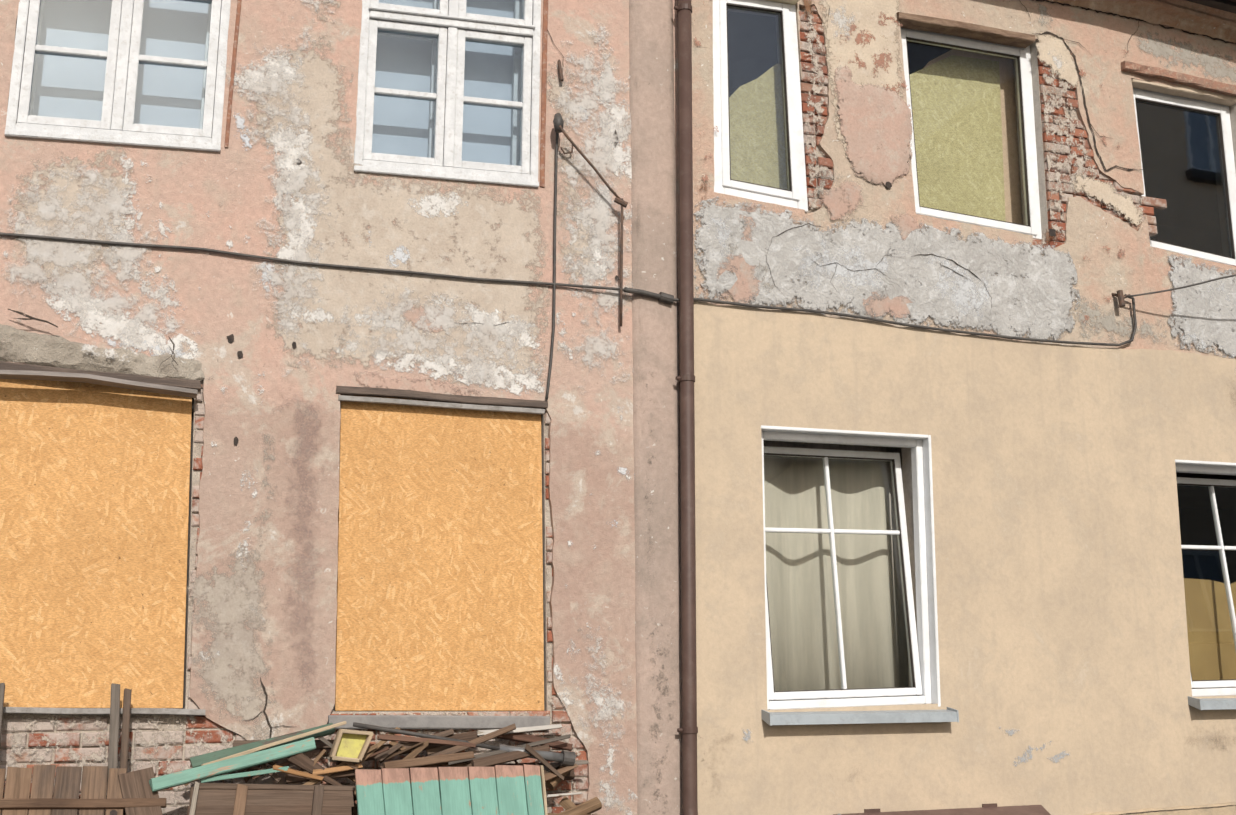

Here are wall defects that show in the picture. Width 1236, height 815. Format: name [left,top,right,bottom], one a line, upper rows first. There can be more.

peeling [0,147,198,362]
peeling [225,0,632,397]
peeling [794,242,912,318]
peeling [928,256,989,315]
flaking render [1032,5,1167,249]
crack [1019,0,1236,171]
peeling [1124,32,1236,81]
peeling [0,380,277,815]
crack [246,677,293,738]